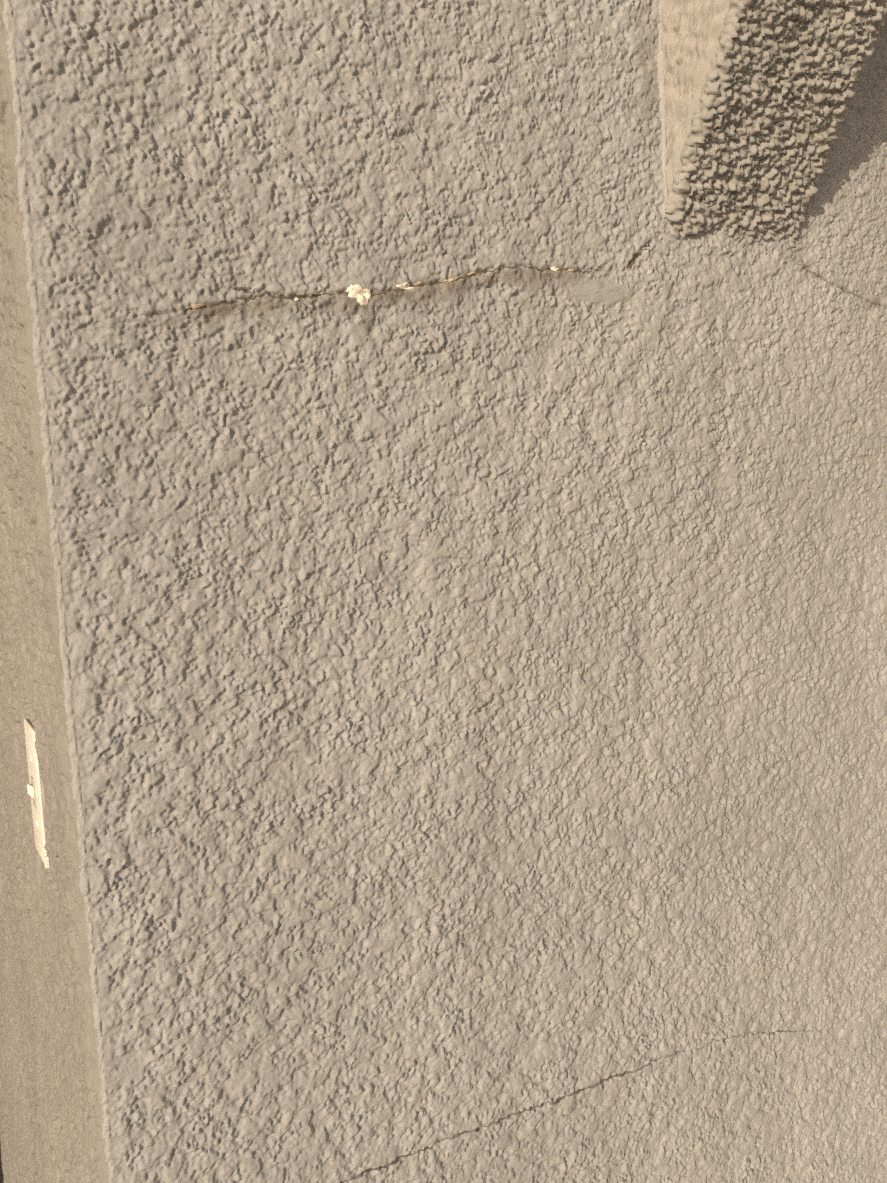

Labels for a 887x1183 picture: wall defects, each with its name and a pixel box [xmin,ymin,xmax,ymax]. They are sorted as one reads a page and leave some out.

crack [119,241,651,321]
crack [341,1030,822,1183]